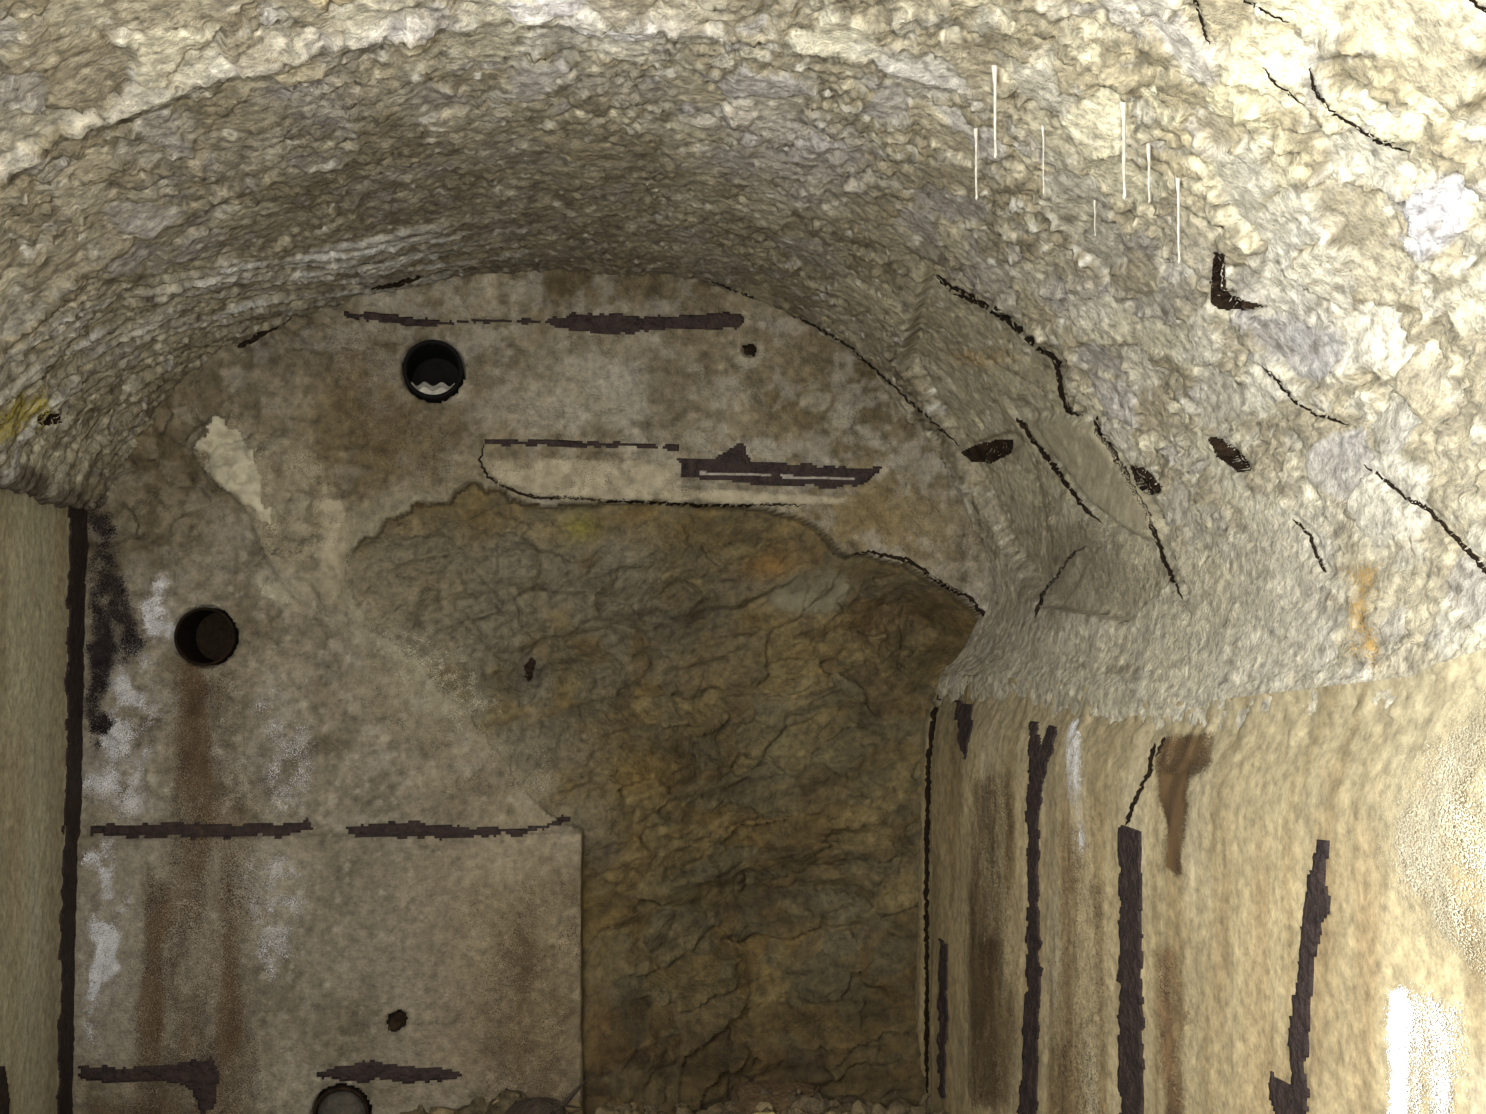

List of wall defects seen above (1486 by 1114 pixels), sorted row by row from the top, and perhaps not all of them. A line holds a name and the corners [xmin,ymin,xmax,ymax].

crack [478,444,806,508]
crack [936,274,1183,617]
spalling [374,624,502,737]
damp [1383,982,1470,1114]